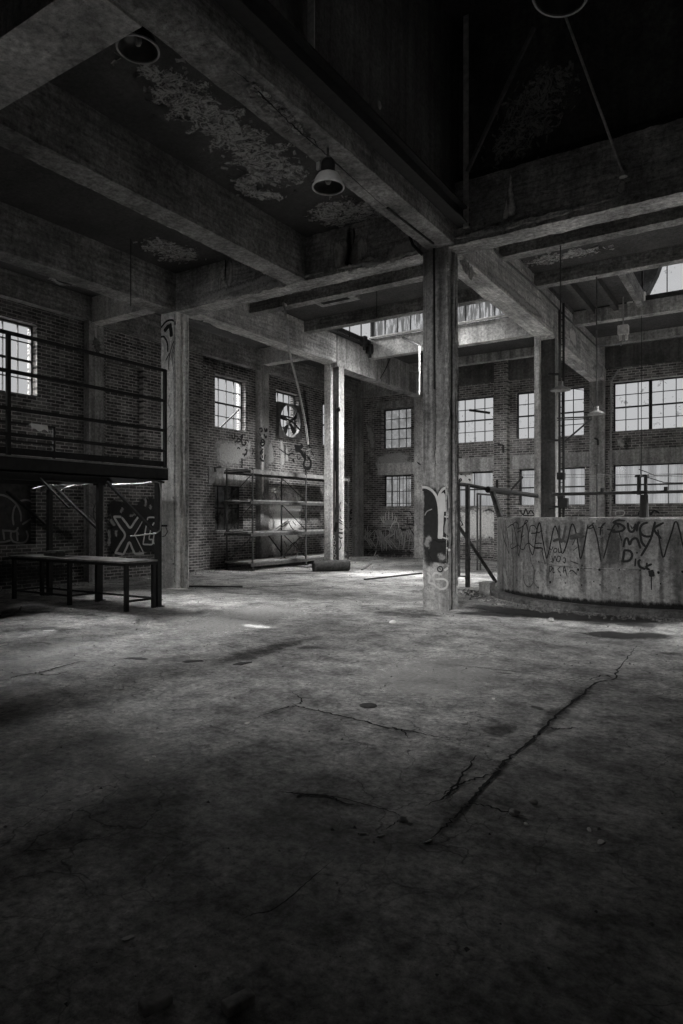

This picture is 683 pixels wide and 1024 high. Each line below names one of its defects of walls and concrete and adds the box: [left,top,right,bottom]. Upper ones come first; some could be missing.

peeling [137,58,315,202]
peeling [304,195,383,232]
peeling [133,237,207,264]
crack [254,692,443,738]
crack [426,646,637,838]
crack [282,791,399,831]